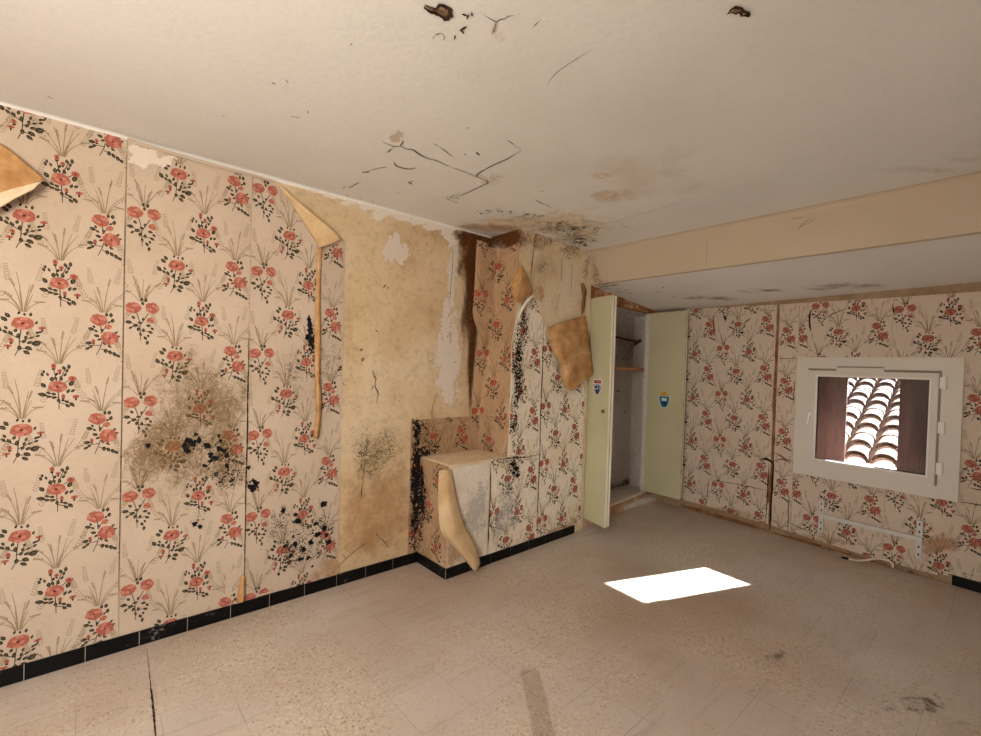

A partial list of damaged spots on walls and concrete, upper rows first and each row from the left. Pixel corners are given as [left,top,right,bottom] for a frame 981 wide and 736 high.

spalling [424,4,473,39]
crack [343,140,521,203]
damp [477,210,612,279]
damp [127,353,260,495]
damp [256,501,334,576]
damp [349,417,439,553]
flaking render [451,462,490,557]
crack [147,651,156,736]